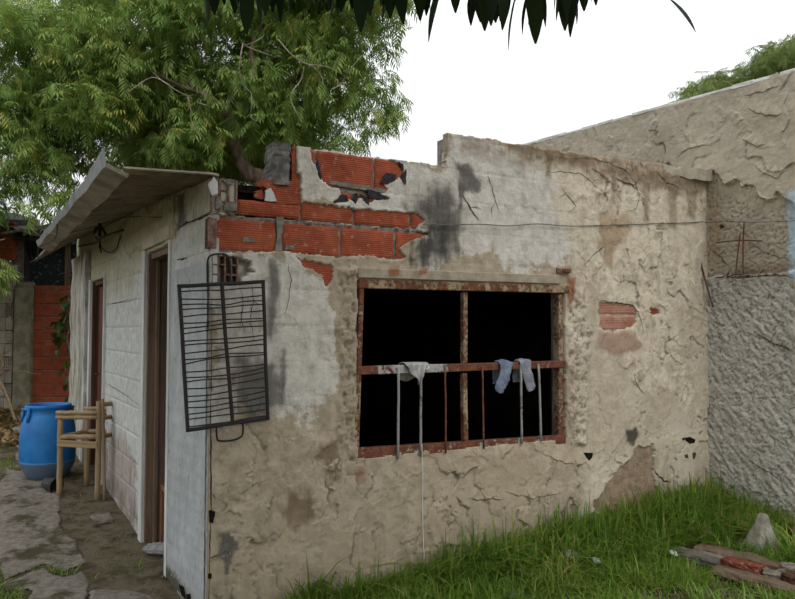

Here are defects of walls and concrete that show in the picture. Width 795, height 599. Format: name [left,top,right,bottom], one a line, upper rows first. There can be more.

peeling [194,150,426,287]
crack [463,177,499,220]
crack [543,157,645,211]
peeling [598,302,641,352]
peeling [591,436,662,518]